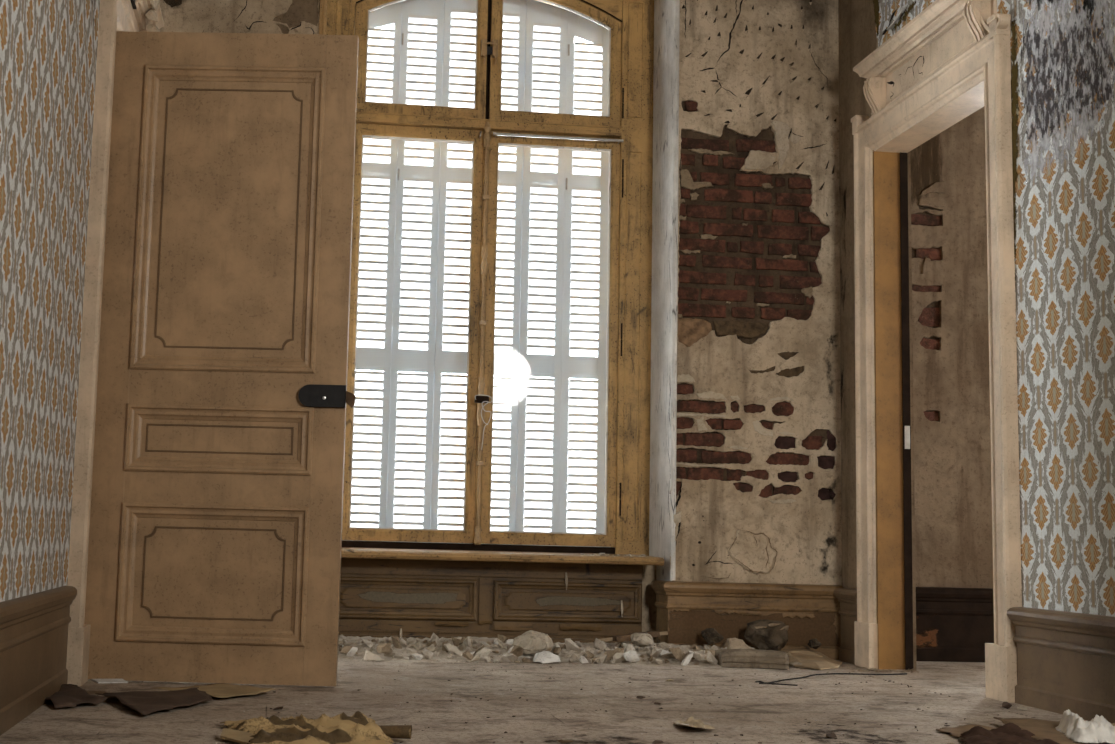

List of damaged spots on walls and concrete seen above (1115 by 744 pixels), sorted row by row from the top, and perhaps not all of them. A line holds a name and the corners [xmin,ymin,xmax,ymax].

flaking render [273,0,318,34]
crack [700,0,745,96]
water stain [873,0,916,36]
flaking render [677,0,837,347]
water stain [910,134,942,200]
spalling [911,181,946,226]
water stain [1011,0,1115,288]
spalling [912,247,942,350]
spalling [670,374,836,504]
spalling [923,411,939,421]